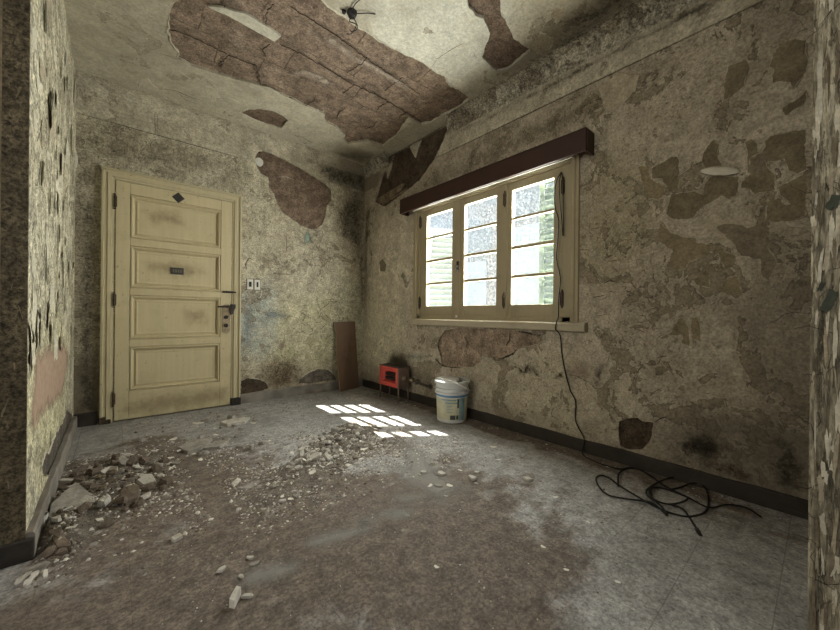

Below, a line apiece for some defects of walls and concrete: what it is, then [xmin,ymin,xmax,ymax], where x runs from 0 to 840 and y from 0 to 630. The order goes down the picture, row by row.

flaking render [165,0,469,144]
flaking render [467,0,530,70]
flaking render [255,151,332,229]
flaking render [376,125,447,206]
flaking render [436,328,543,368]
peeling [639,39,840,630]
flaking render [617,416,667,450]